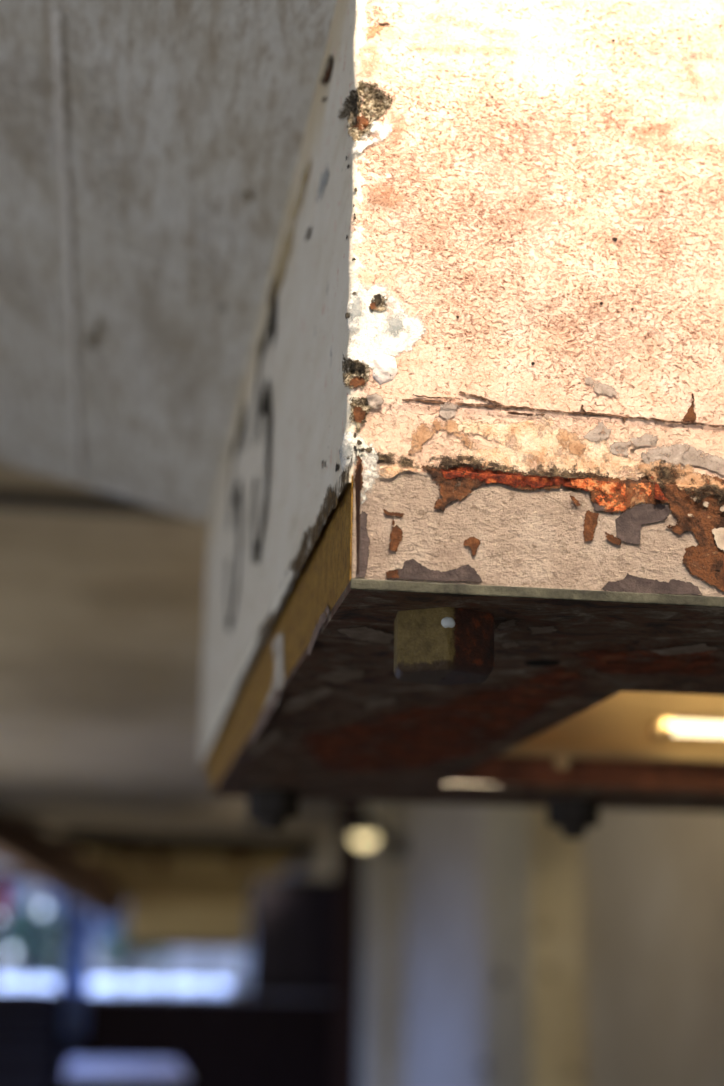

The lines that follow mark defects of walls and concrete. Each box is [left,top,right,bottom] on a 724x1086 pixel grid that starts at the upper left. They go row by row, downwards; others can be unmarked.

spalling [338,80,393,169]
crack [402,391,724,428]
peeling [209,281,426,757]
rust [374,452,724,592]
peeling [593,503,671,545]
peeling [385,559,482,582]
peeling [602,573,703,596]